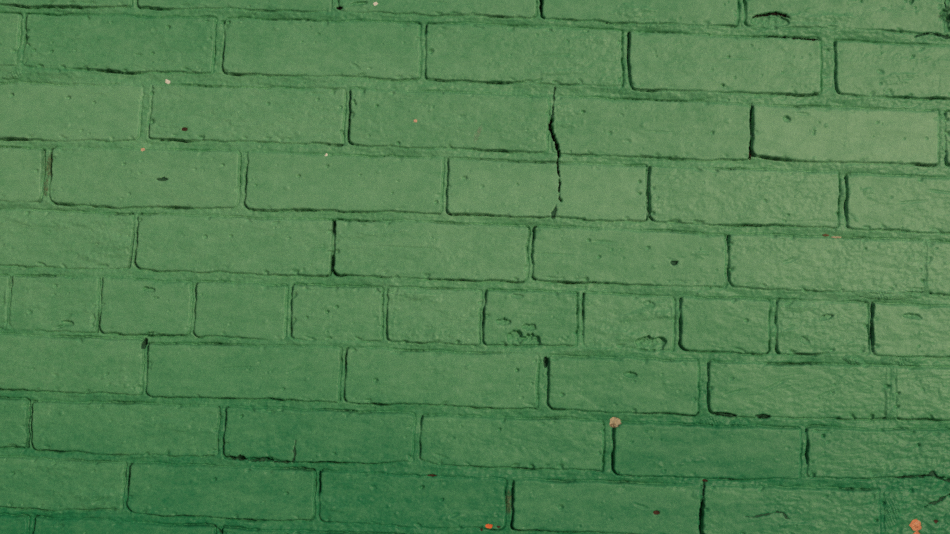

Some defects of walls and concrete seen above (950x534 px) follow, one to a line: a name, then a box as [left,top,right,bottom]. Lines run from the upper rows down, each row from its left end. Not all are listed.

crack [548,87,561,219]
crack [895,471,950,507]
peeling [909,519,922,534]